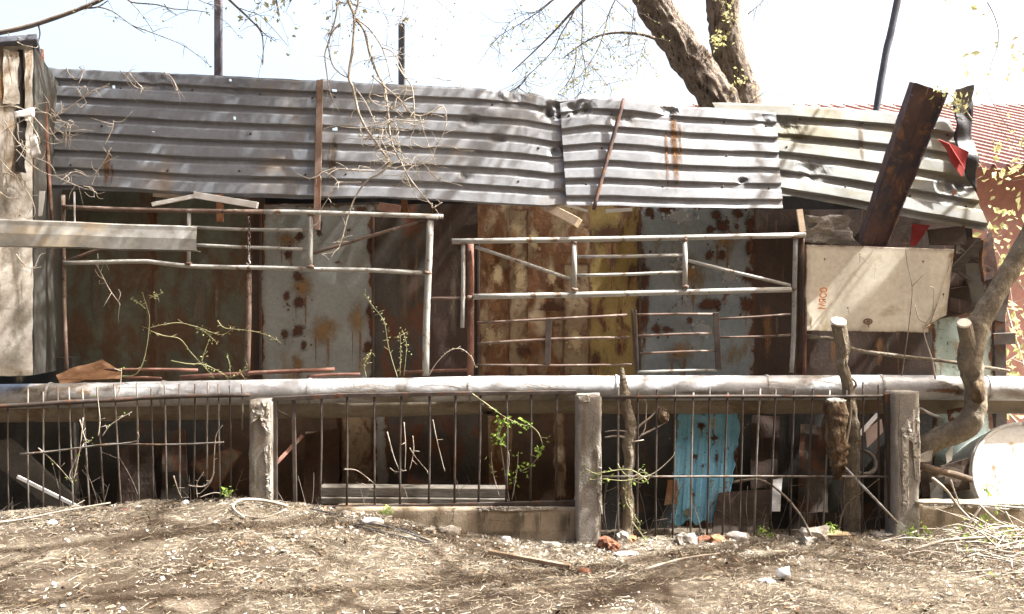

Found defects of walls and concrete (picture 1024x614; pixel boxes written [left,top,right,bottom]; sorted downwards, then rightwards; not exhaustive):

corrosion [665,119,682,181]
corrosion [644,207,679,220]
corrosion [594,225,622,290]
corrosion [681,209,762,323]
corrosion [275,222,336,379]
corrosion [350,296,375,368]
corrosion [517,302,565,368]
corrosion [591,352,600,375]
corrosion [628,250,689,375]